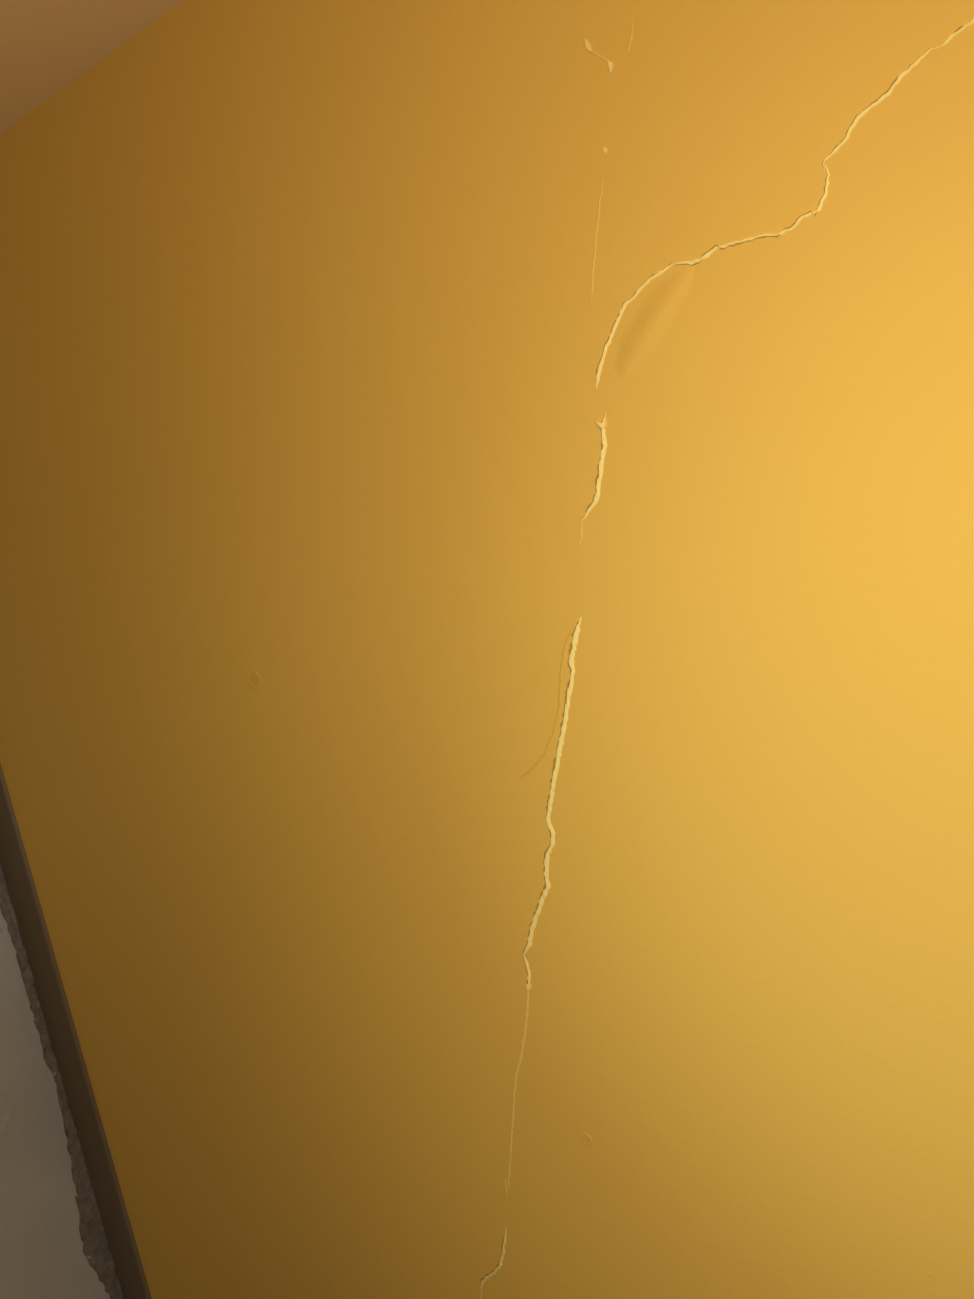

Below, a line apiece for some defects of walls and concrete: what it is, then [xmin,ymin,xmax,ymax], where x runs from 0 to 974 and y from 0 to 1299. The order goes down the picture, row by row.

crack [580,18,974,548]
crack [504,617,582,1196]
crack [480,1227,506,1299]